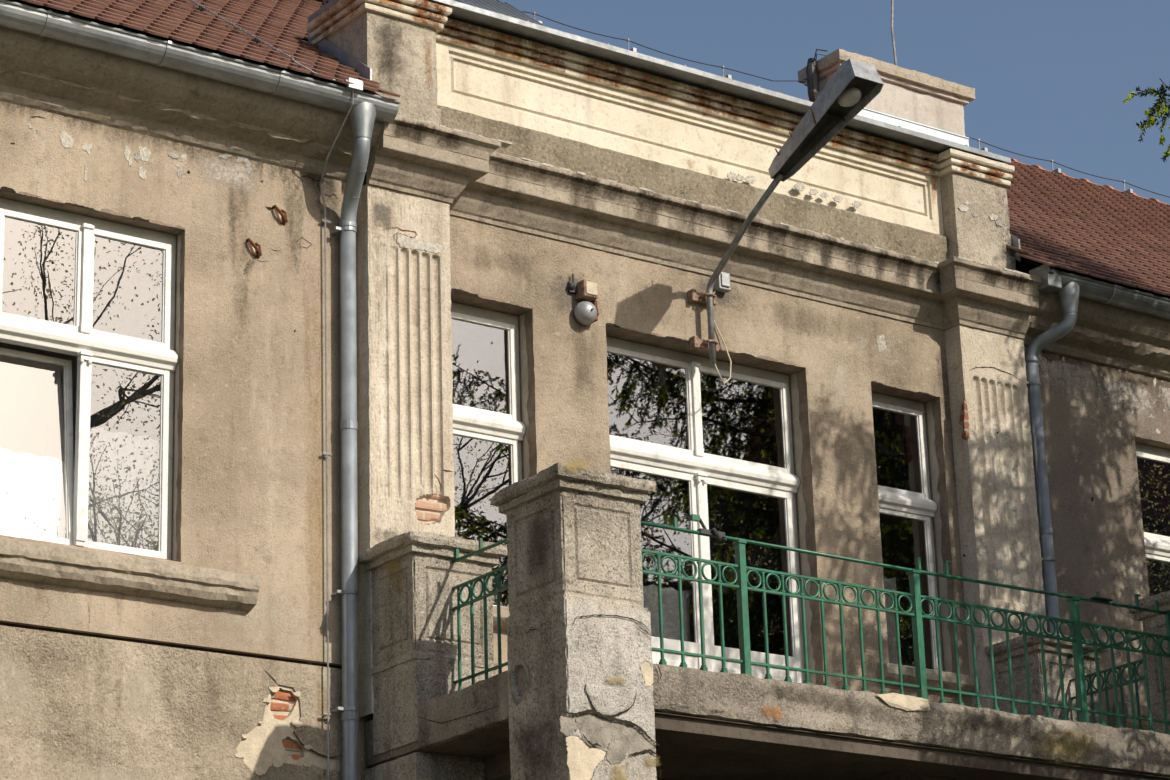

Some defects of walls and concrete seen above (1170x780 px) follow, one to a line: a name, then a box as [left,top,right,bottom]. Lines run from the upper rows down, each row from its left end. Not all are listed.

corrosion [414,0,565,73]
corrosion [582,58,677,100]
corrosion [688,88,803,134]
corrosion [830,128,937,189]
damp [495,161,624,208]
damp [637,190,941,290]
flaking render [871,381,940,397]
flaking render [959,399,970,440]
flaking render [415,494,448,525]
flaking render [234,685,339,776]
flaking render [559,713,655,780]